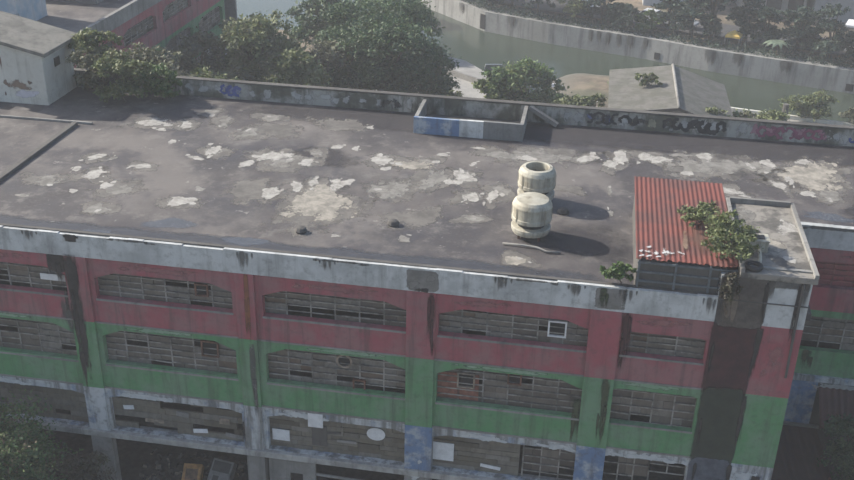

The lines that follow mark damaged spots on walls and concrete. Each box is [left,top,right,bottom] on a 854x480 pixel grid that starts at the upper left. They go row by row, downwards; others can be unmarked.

spalling [3,80,32,95]
peeling [119,107,854,242]
damp [46,254,91,384]
damp [0,216,591,295]
spalling [406,269,439,292]
damp [416,288,435,353]
damp [527,227,623,261]
damp [600,288,638,305]
damp [618,313,632,367]
damp [686,273,810,480]
damp [596,379,610,436]